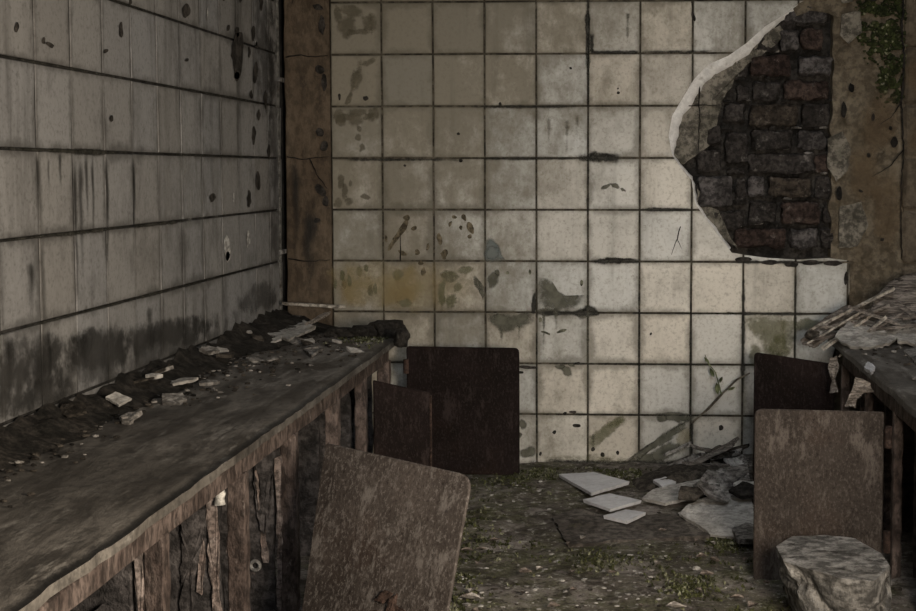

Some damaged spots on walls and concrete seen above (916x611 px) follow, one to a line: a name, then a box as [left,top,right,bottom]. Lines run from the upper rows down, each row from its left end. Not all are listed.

leakage [334,5,376,38]
leakage [334,59,442,161]
spalling [669,0,906,310]
leakage [5,168,123,241]
leakage [133,165,181,227]
leakage [39,271,241,324]
leakage [474,239,504,298]
leakage [490,279,600,437]
flaking render [833,348,860,411]